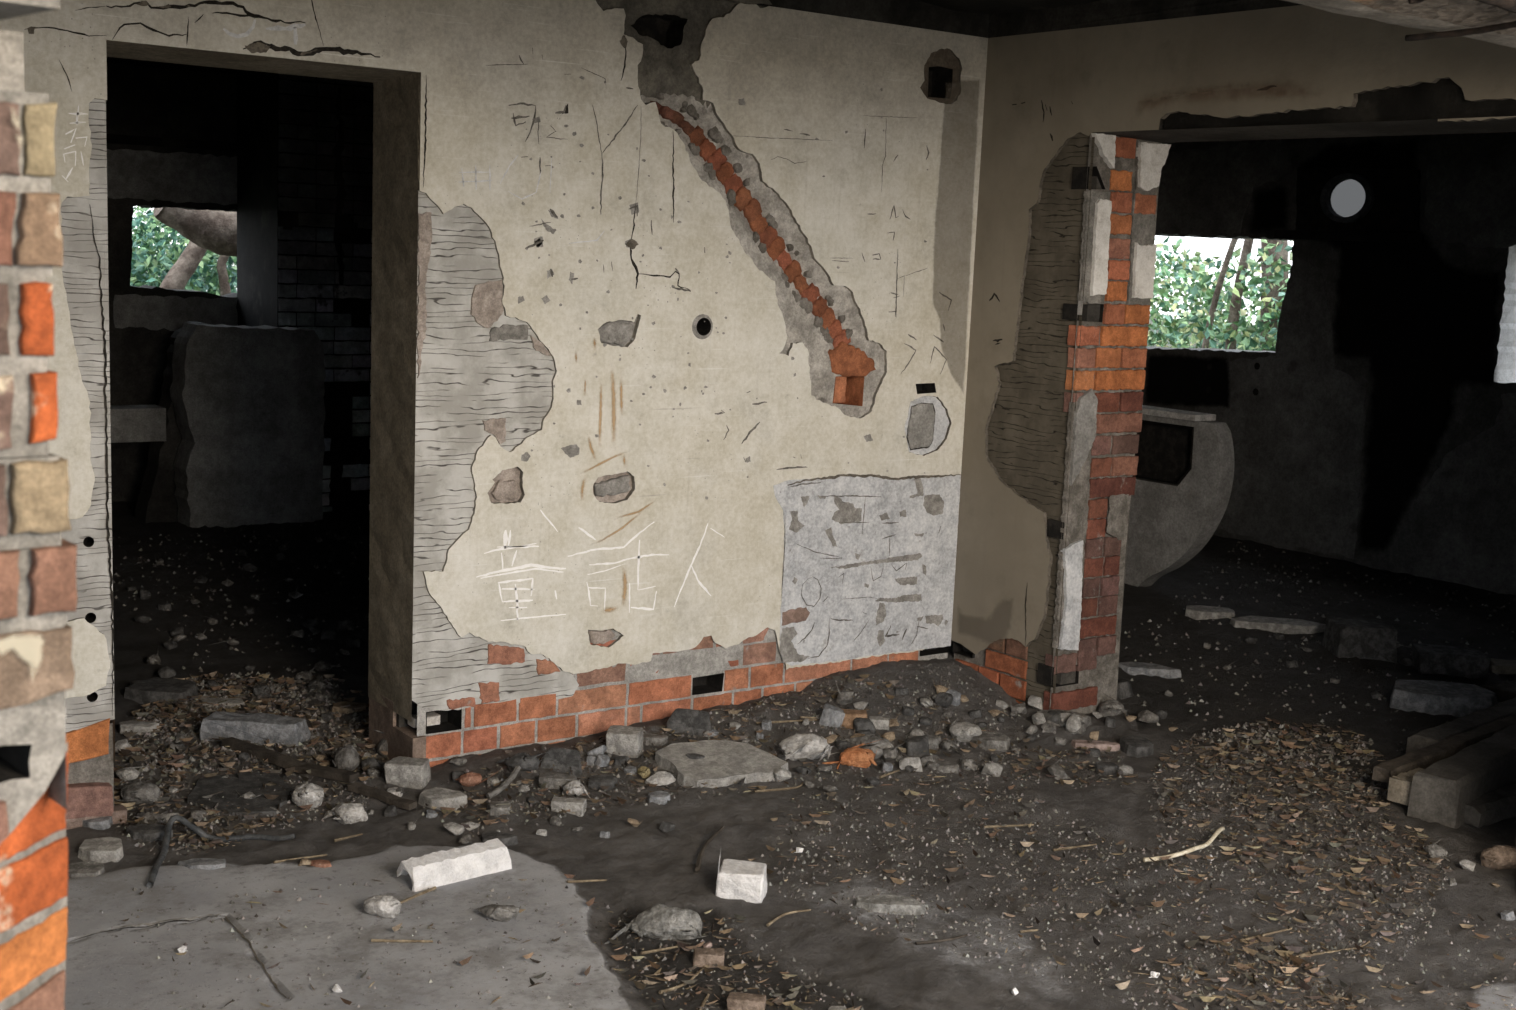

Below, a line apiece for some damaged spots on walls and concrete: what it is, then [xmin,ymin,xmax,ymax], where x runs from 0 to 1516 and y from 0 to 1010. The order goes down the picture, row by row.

crack [24,0,380,91]
spalling [604,0,887,442]
spalling [1405,0,1516,41]
spalling [61,99,258,830]
spalling [359,132,1178,793]
spalling [536,805,610,838]